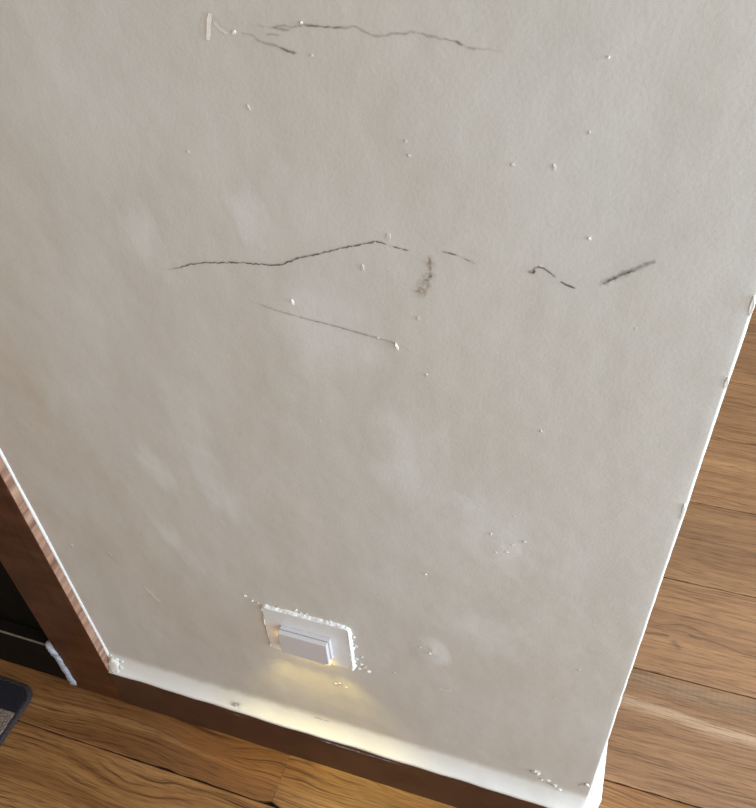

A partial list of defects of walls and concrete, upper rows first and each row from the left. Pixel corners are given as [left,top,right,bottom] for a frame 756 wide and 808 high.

crack [181,241,407,268]
peeling [244,595,371,673]